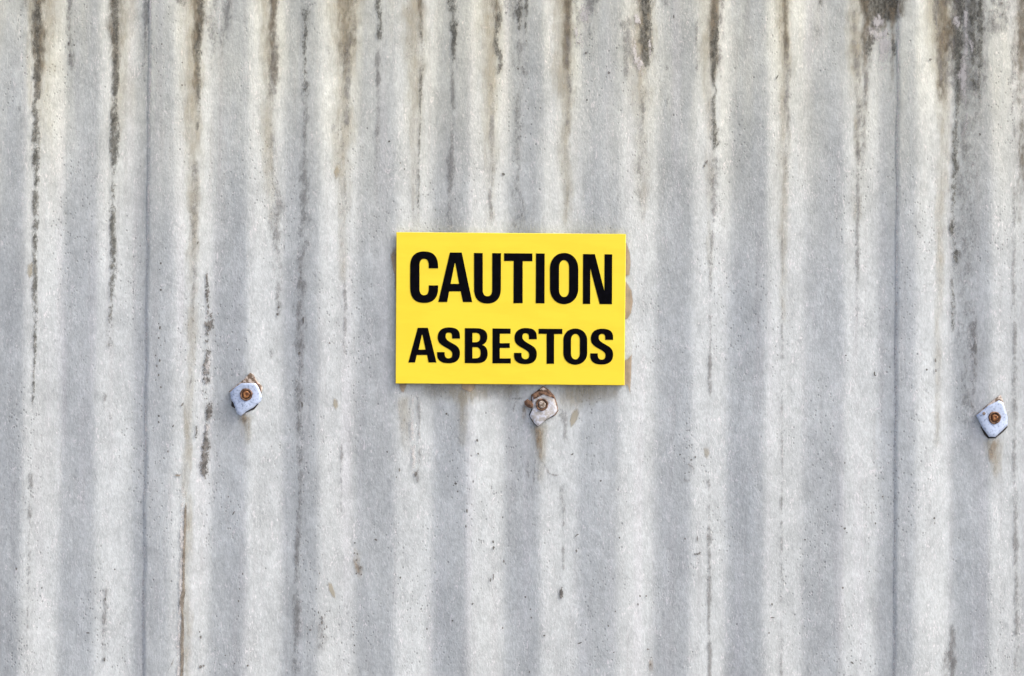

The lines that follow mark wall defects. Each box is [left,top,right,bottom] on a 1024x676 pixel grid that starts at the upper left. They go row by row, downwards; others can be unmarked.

water stain [109,0,120,173]
water stain [181,0,204,107]
water stain [337,0,353,61]
water stain [929,0,983,206]
water stain [29,0,52,401]
water stain [108,187,116,323]
rust [524,388,554,410]